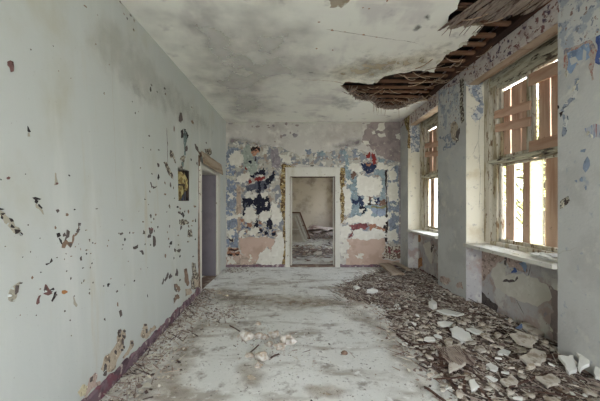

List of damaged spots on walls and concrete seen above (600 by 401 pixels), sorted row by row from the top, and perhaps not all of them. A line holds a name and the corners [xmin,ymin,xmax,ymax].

peeling [557,0,600,139]
peeling [0,208,23,236]
peeling [46,223,96,269]
peeling [149,112,212,194]
peeling [162,198,200,303]
peeling [226,150,292,265]
peeling [340,115,420,259]
peeling [437,77,484,151]
peeling [7,282,23,302]
peeling [482,251,558,343]
peeling [78,329,134,398]